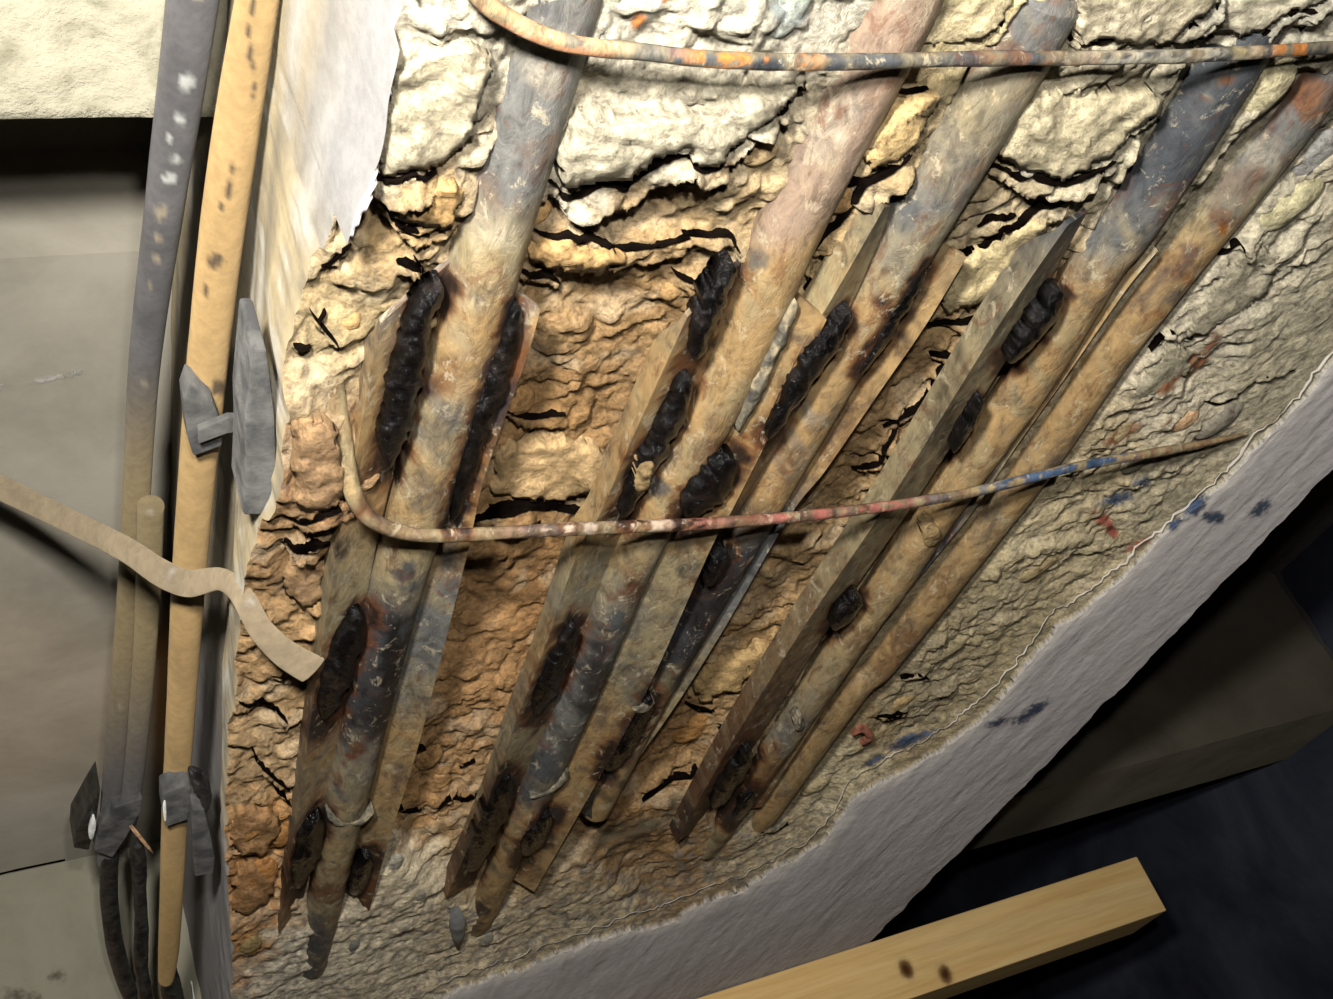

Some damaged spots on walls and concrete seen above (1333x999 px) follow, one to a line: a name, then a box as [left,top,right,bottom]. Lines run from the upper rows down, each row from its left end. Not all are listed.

spalling [499,0,538,15]
spalling [592,0,876,53]
crack [377,168,438,274]
crack [522,86,807,284]
crack [803,154,913,291]
spalling [797,0,1047,295]
crack [961,160,1117,256]
crack [293,307,339,352]
crack [851,315,974,469]
crack [284,505,342,554]
crack [474,499,580,522]
spalling [224,56,1333,999]